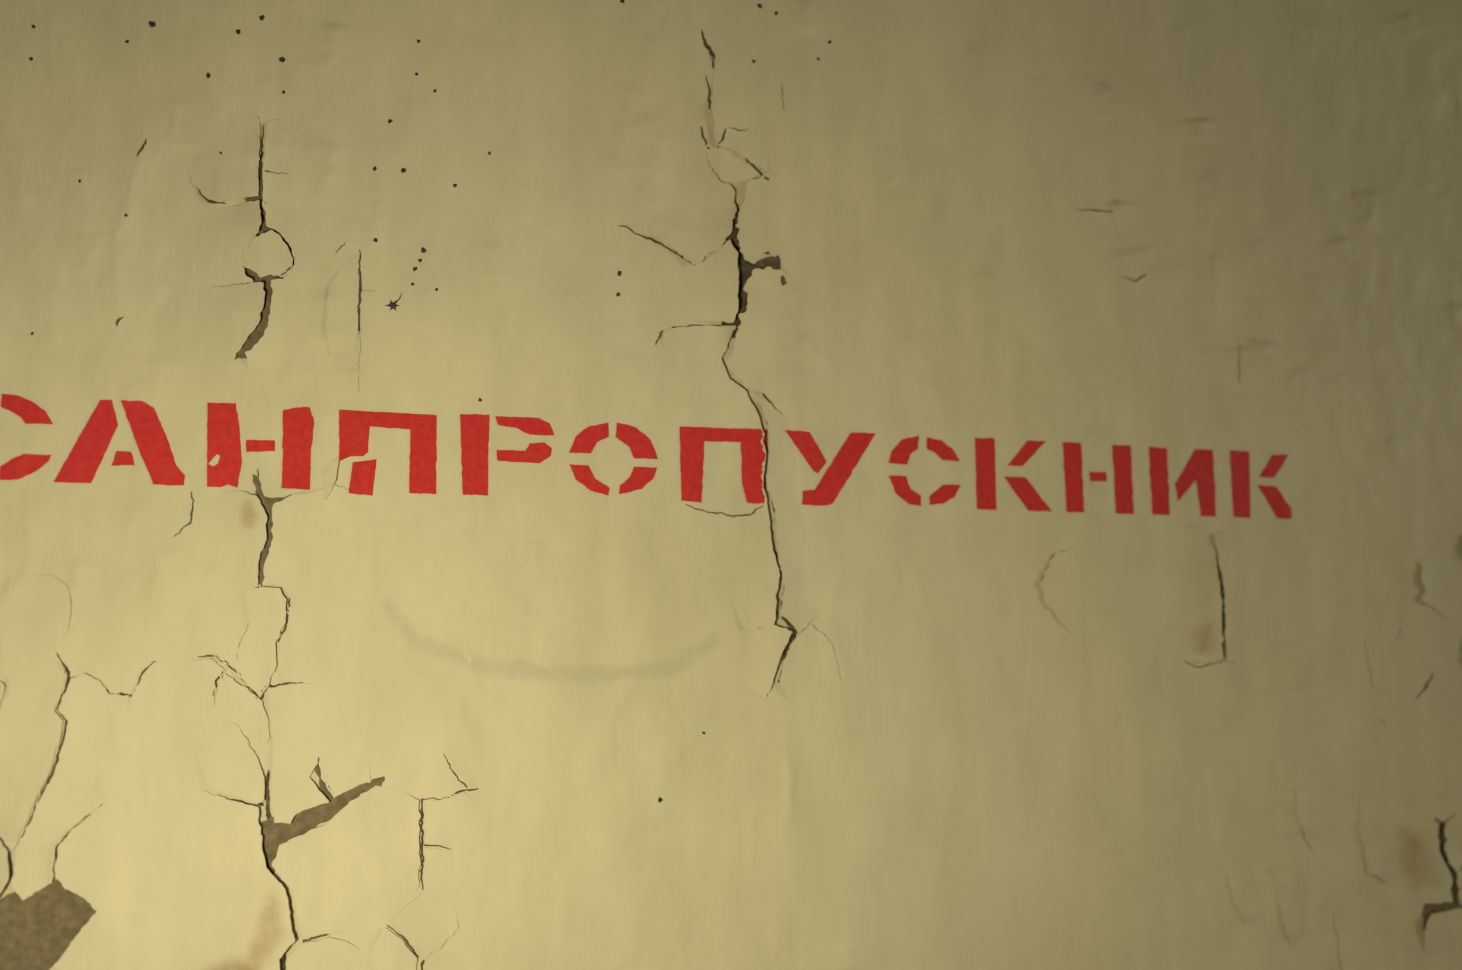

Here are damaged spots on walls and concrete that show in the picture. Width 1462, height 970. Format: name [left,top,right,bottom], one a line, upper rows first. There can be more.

crack [701,30,769,180]
crack [197,170,291,279]
crack [620,225,695,266]
crack [756,252,787,285]
crack [655,324,733,345]
crack [685,504,763,517]
peeling [1417,555,1457,620]
peeling [0,459,474,970]